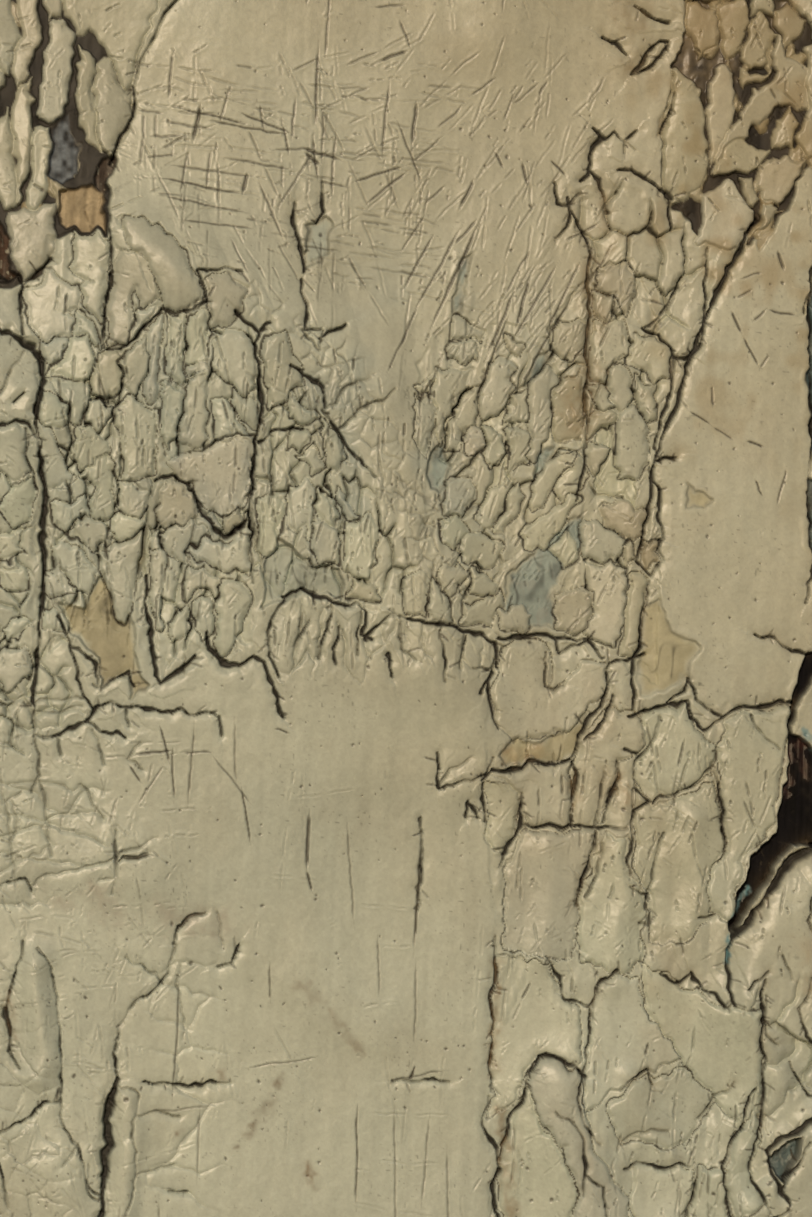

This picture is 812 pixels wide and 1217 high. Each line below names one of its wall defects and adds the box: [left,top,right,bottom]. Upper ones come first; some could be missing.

crack [109,0,179,167]
crack [601,0,687,77]
crack [0,181,794,927]
peeling [0,0,812,929]
crack [553,92,676,503]
crack [753,633,806,656]
crack [803,267,812,606]
peeling [0,939,106,1217]
crack [0,911,241,1217]
peeling [125,919,248,1217]
crack [481,843,812,1217]
peeling [484,638,812,1217]